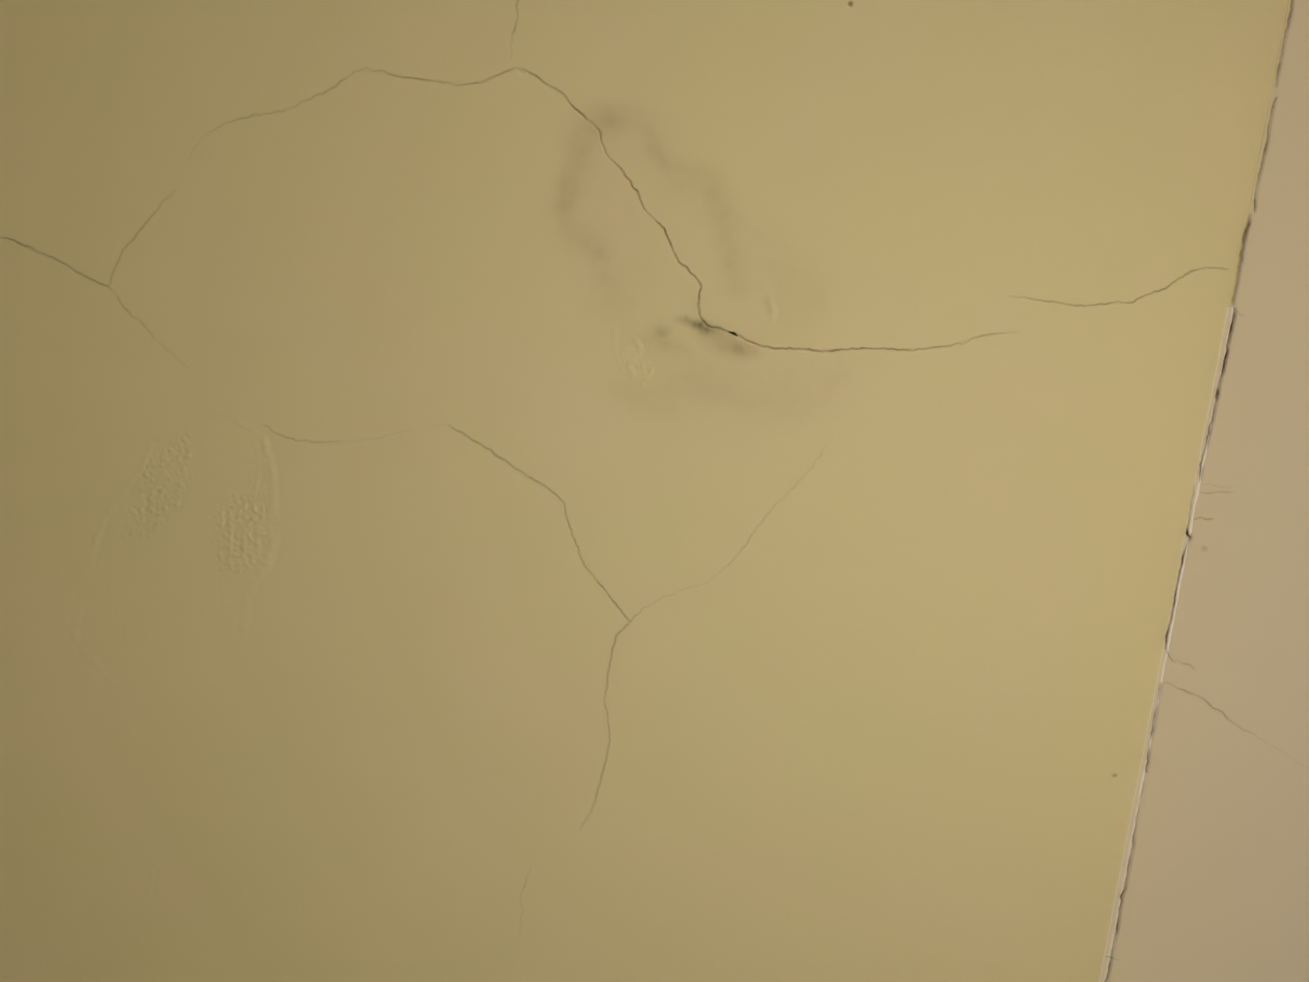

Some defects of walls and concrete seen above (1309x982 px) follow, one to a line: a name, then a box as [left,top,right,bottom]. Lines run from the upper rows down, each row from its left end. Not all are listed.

crack [1240,64,1280,261]
crack [1199,312,1235,476]
crack [1165,529,1191,644]
crack [1106,878,1127,979]